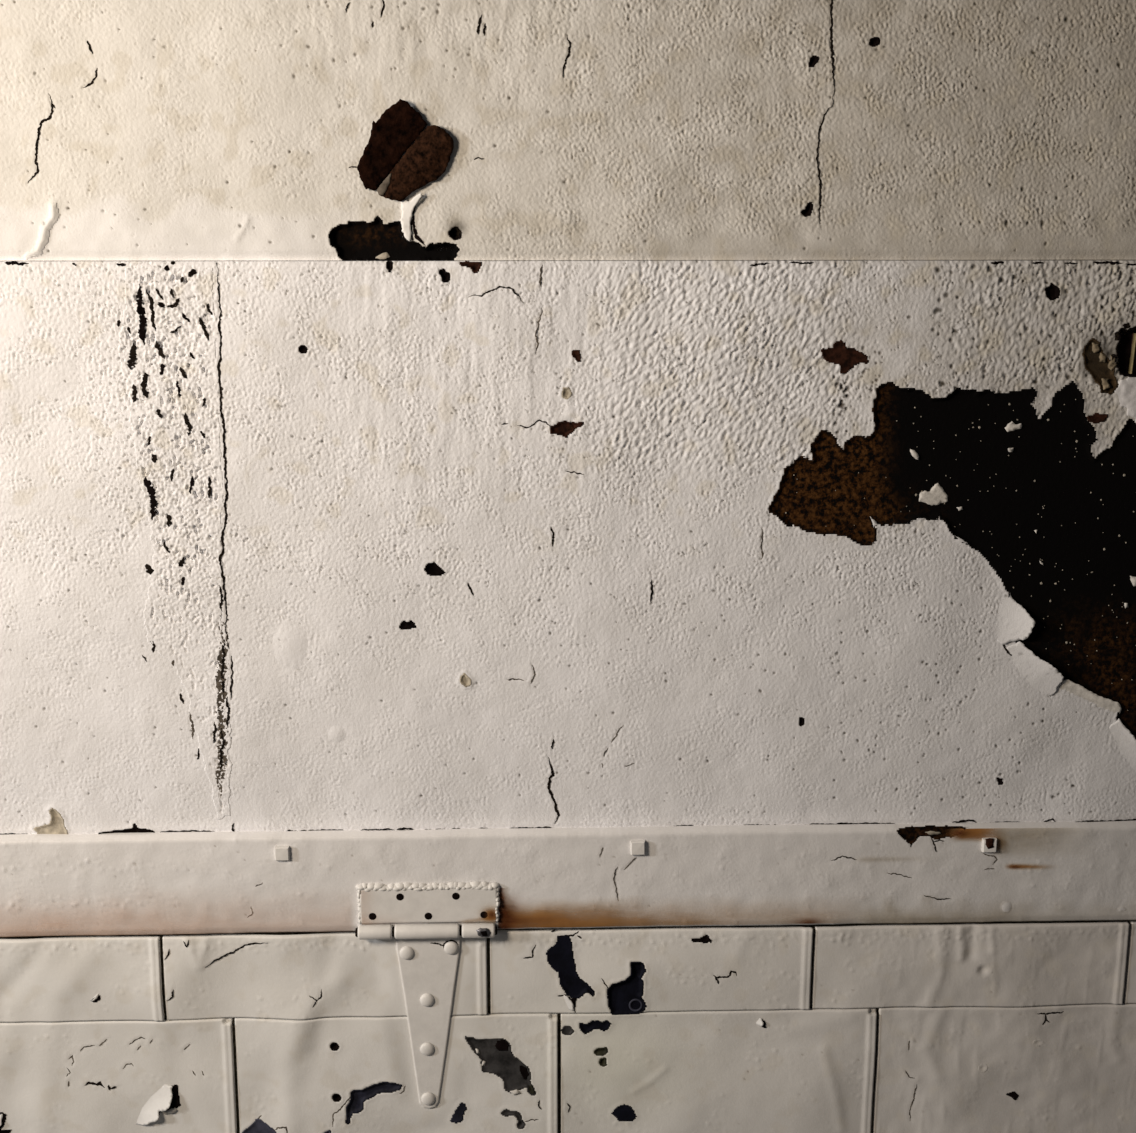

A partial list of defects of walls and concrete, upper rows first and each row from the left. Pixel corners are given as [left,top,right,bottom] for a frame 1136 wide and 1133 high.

crack [816,0,835,224]
peeling [328,99,482,282]
peeling [821,340,869,374]
crack [216,262,234,694]
peeling [769,381,1136,771]
crack [547,739,560,824]
peeling [897,825,965,844]
rust [954,828,1003,848]
rust [480,888,710,929]
peeling [546,935,646,1035]
peeling [345,1082,402,1124]
peeling [465,1036,536,1096]